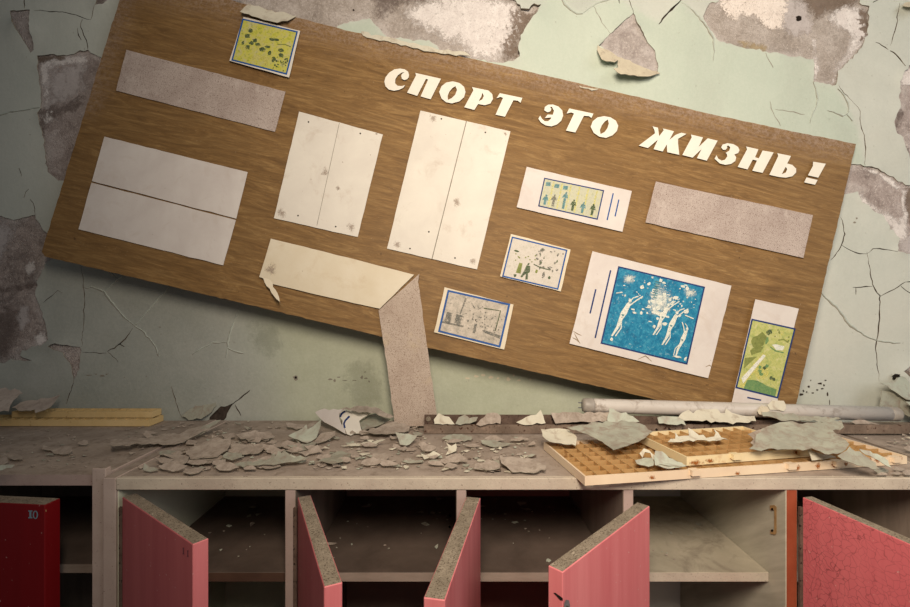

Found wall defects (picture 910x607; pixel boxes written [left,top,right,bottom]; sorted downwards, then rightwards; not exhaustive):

peeling [233,0,540,63]
peeling [597,14,660,77]
peeling [703,0,869,86]
peeling [10,10,101,181]
peeling [894,65,910,156]
peeling [844,164,910,254]
peeling [0,215,107,378]
crack [82,272,170,360]
crack [834,221,910,370]
peeling [879,367,910,417]